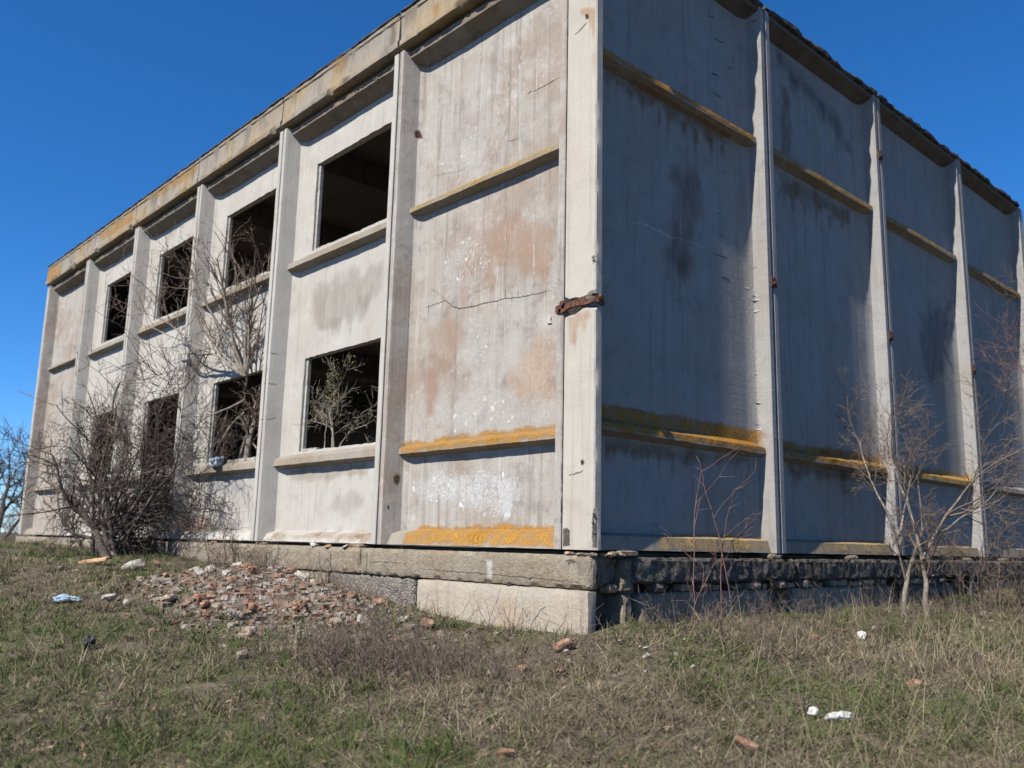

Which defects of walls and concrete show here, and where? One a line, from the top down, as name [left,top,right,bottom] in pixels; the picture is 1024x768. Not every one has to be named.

crack [425,288,552,312]